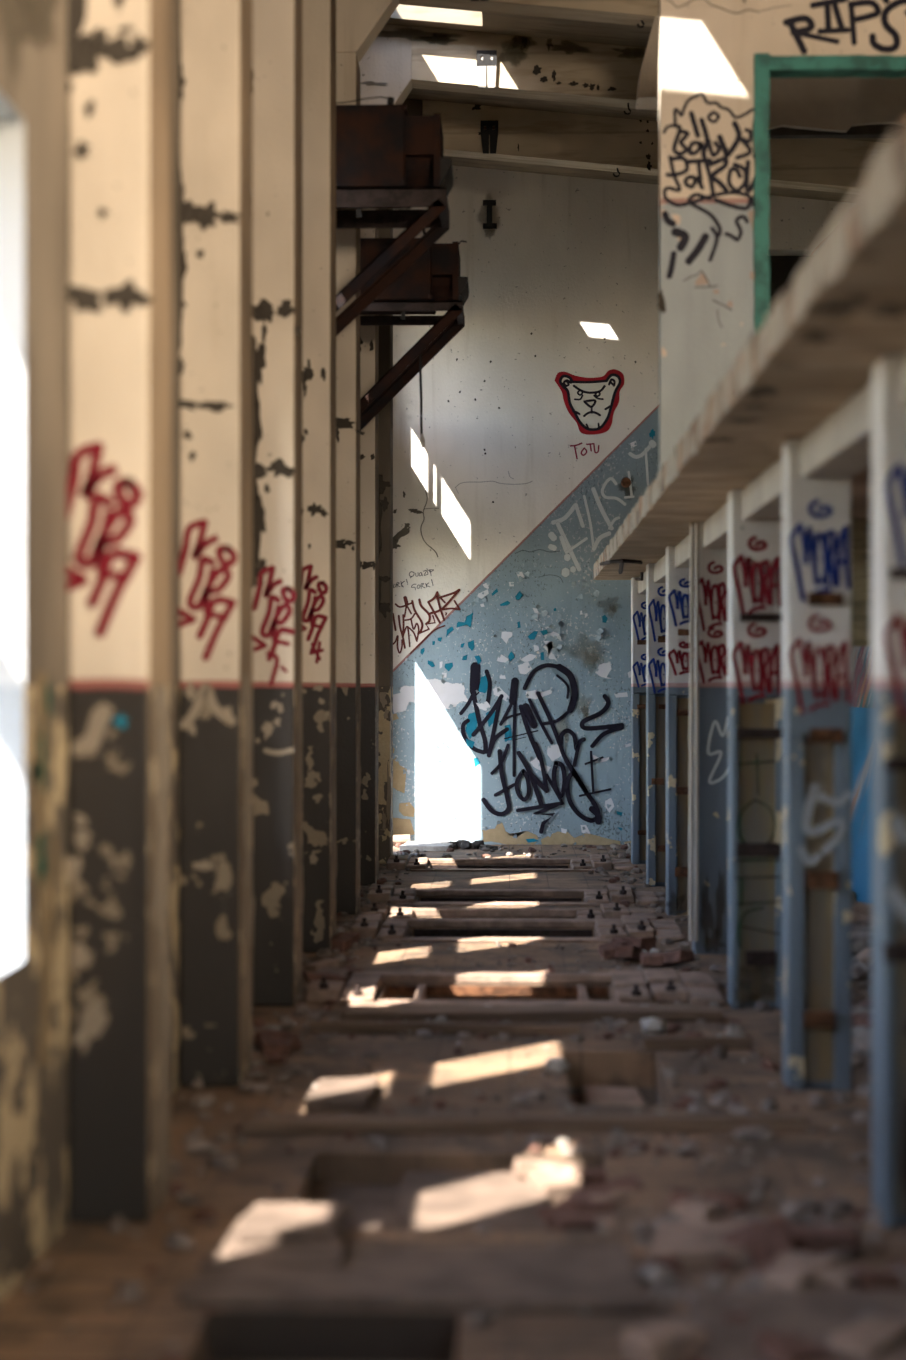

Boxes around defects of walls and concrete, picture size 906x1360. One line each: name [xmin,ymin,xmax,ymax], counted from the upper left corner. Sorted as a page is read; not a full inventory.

spalling [67,0,150,92]
spalling [85,100,95,119]
spalling [74,140,91,159]
spalling [179,164,241,278]
spalling [67,279,153,313]
spalling [253,299,302,446]
spalling [179,400,234,413]
spalling [183,430,196,462]
spalling [253,458,295,584]
peeling [71,701,115,758]
peeling [71,997,109,1055]